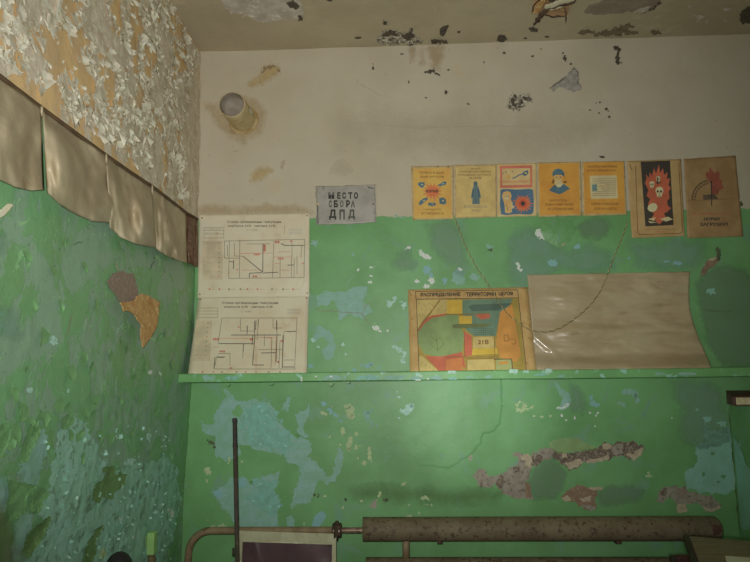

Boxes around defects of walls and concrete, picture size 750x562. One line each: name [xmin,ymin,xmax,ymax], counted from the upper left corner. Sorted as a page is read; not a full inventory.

spalling [221,0,304,25]
peeling [532,0,576,26]
spalling [584,0,661,15]
peeling [0,0,201,218]
spalling [550,67,582,92]
peeling [107,263,161,348]
peeling [0,416,182,562]
peeling [201,388,378,527]
spalling [473,441,645,500]
spalling [561,484,605,511]